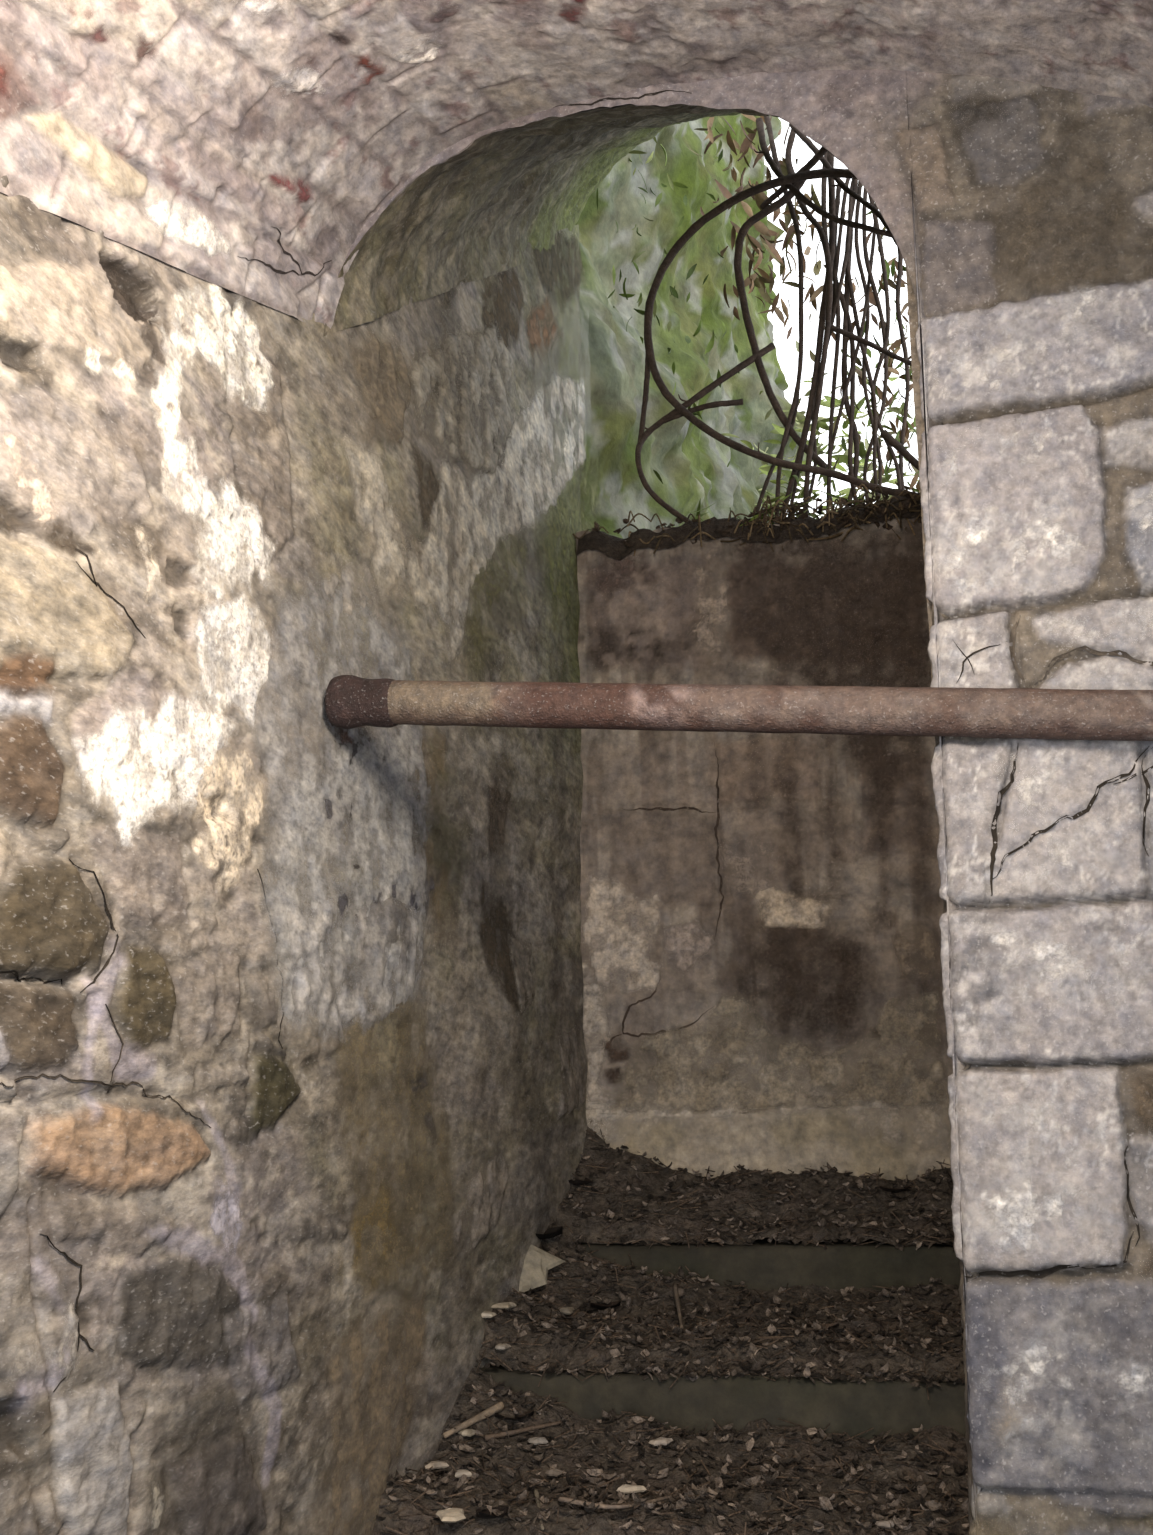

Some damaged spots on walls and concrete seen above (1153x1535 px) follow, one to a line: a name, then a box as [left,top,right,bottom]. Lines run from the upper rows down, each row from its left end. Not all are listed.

water stain [590,631,665,664]
water stain [683,532,931,687]
crack [989,746,1153,902]
water stain [742,927,858,1031]